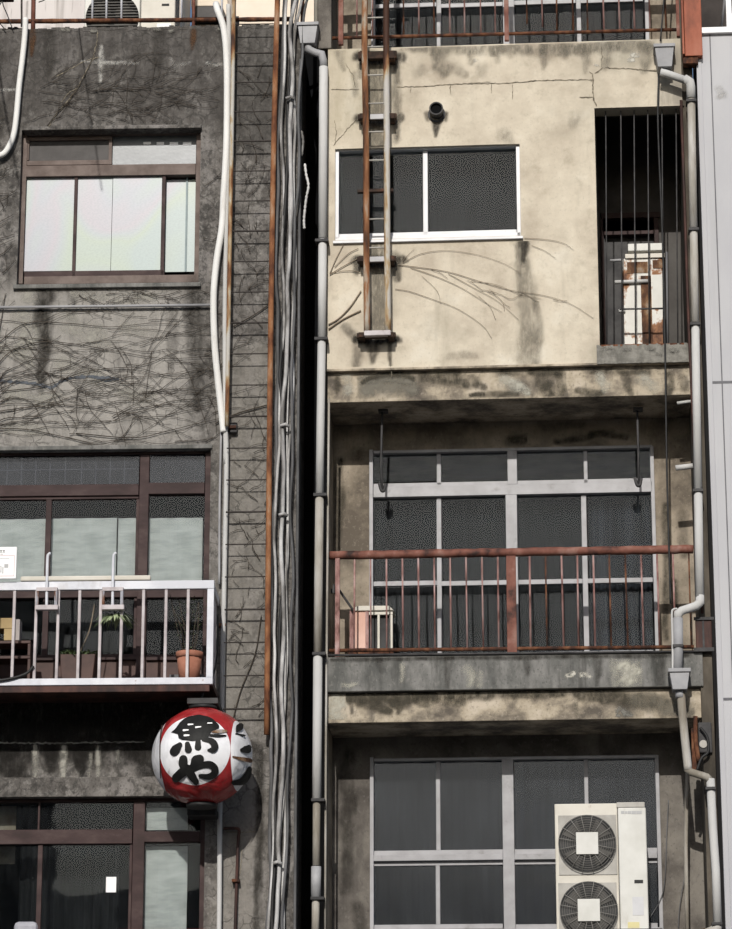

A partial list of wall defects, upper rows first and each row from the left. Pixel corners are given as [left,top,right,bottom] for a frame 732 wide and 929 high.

crack [398,47,657,106]
leakage [519,241,528,271]
leakage [38,289,54,389]
leakage [359,371,518,397]
leakage [524,328,603,396]
leakage [346,690,693,715]